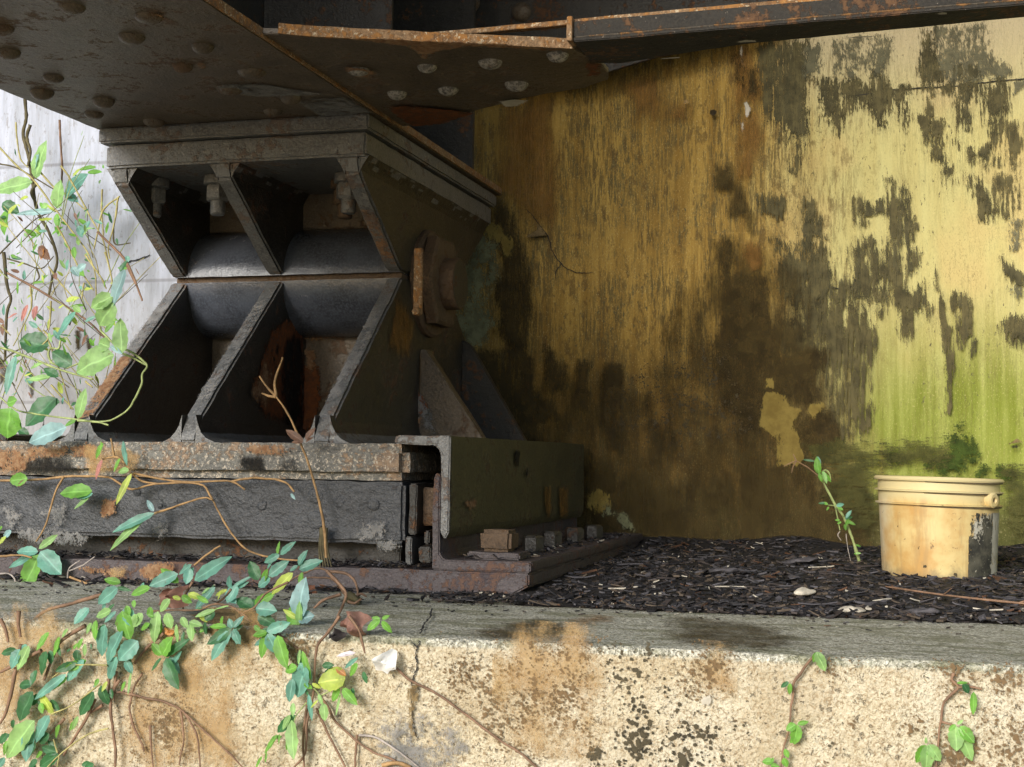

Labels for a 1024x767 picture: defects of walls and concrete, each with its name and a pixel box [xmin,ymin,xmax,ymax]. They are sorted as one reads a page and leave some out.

rust [347,37,568,59]
rust [576,0,1024,38]
leakage [740,21,1024,251]
crack [526,209,591,278]
leakage [476,164,979,547]
leakage [996,312,1024,350]
peeling [759,378,825,467]
crack [411,608,433,737]